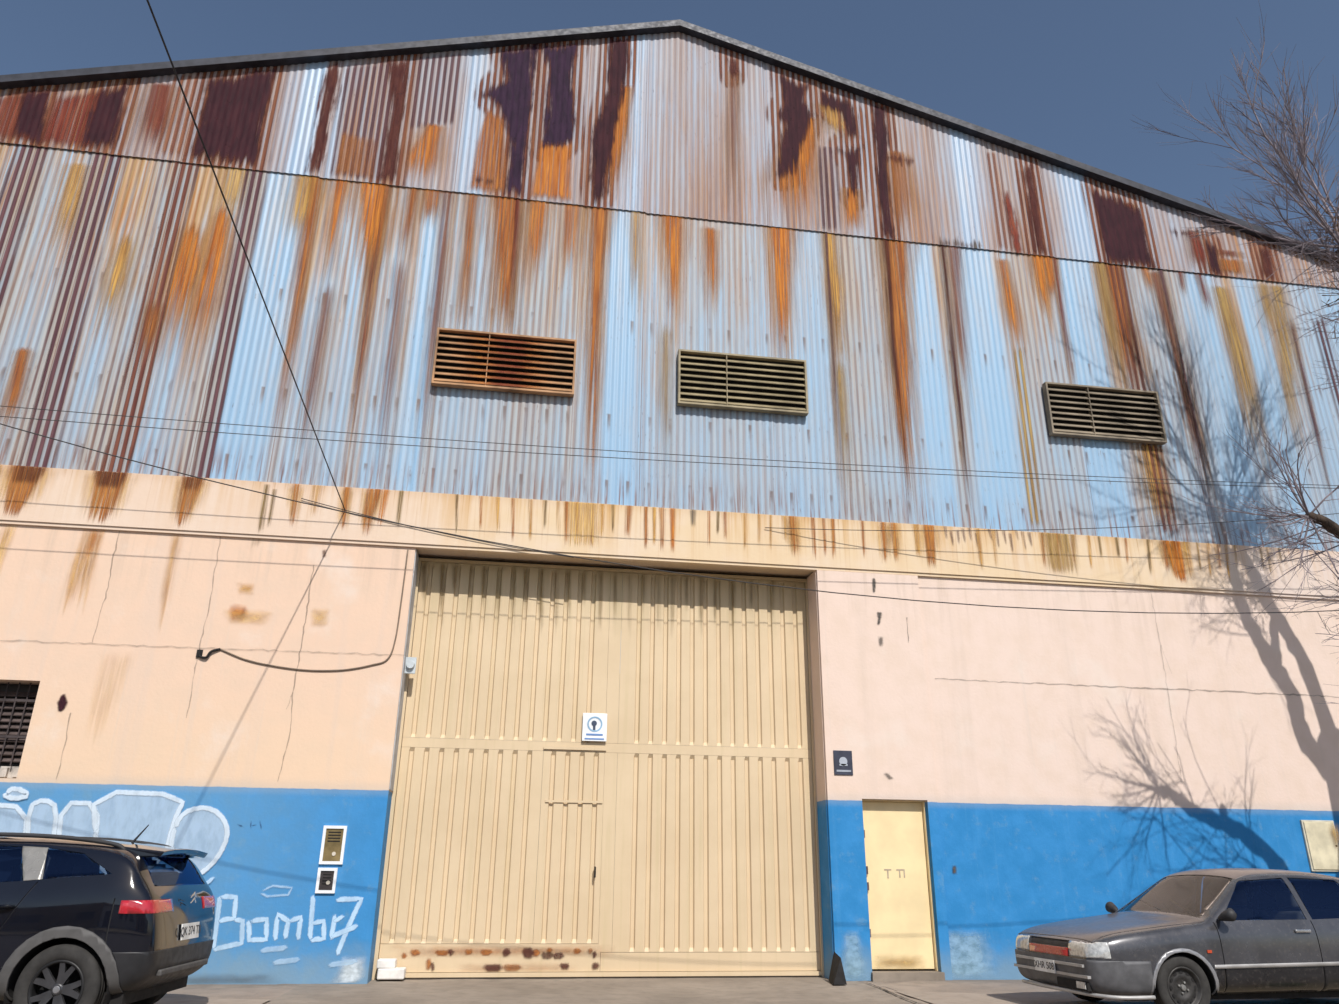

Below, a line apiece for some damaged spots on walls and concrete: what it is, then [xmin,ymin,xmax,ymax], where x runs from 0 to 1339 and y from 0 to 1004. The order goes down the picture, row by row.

corrosion [719,47,745,87]
corrosion [0,65,284,528]
corrosion [342,487,403,532]
corrosion [480,497,674,547]
corrosion [767,66,913,469]
corrosion [940,245,966,465]
corrosion [913,351,1128,570]
corrosion [987,153,1065,332]
corrosion [1082,176,1204,450]
corrosion [1143,445,1237,580]
corrosion [1175,229,1326,471]
corrosion [402,948,599,971]